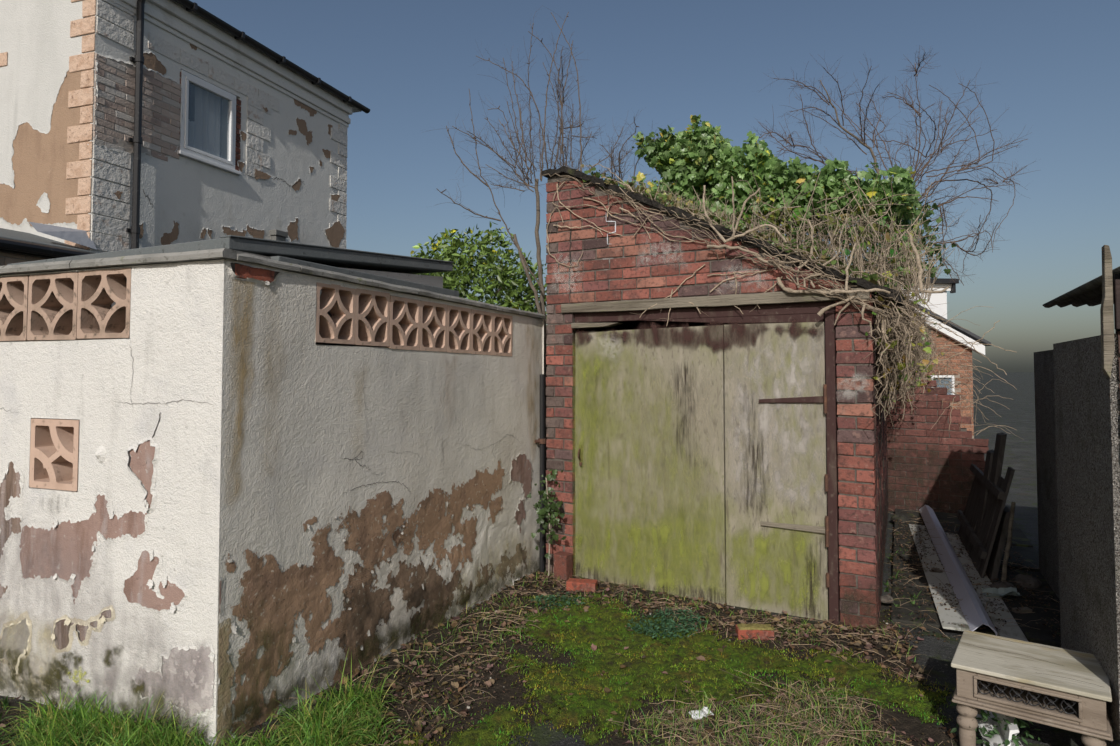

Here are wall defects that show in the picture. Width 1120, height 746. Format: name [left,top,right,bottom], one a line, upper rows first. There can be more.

flaking render [0,51,183,229]
peeling [287,99,333,192]
peeling [158,220,181,245]
peeling [199,224,265,240]
flaking render [226,259,283,287]
peeling [324,220,345,248]
damp [234,296,251,441]
crack [341,356,422,497]
damp [734,342,814,506]
flaking render [0,611,32,677]
peeling [0,435,190,653]
peeling [130,450,534,746]